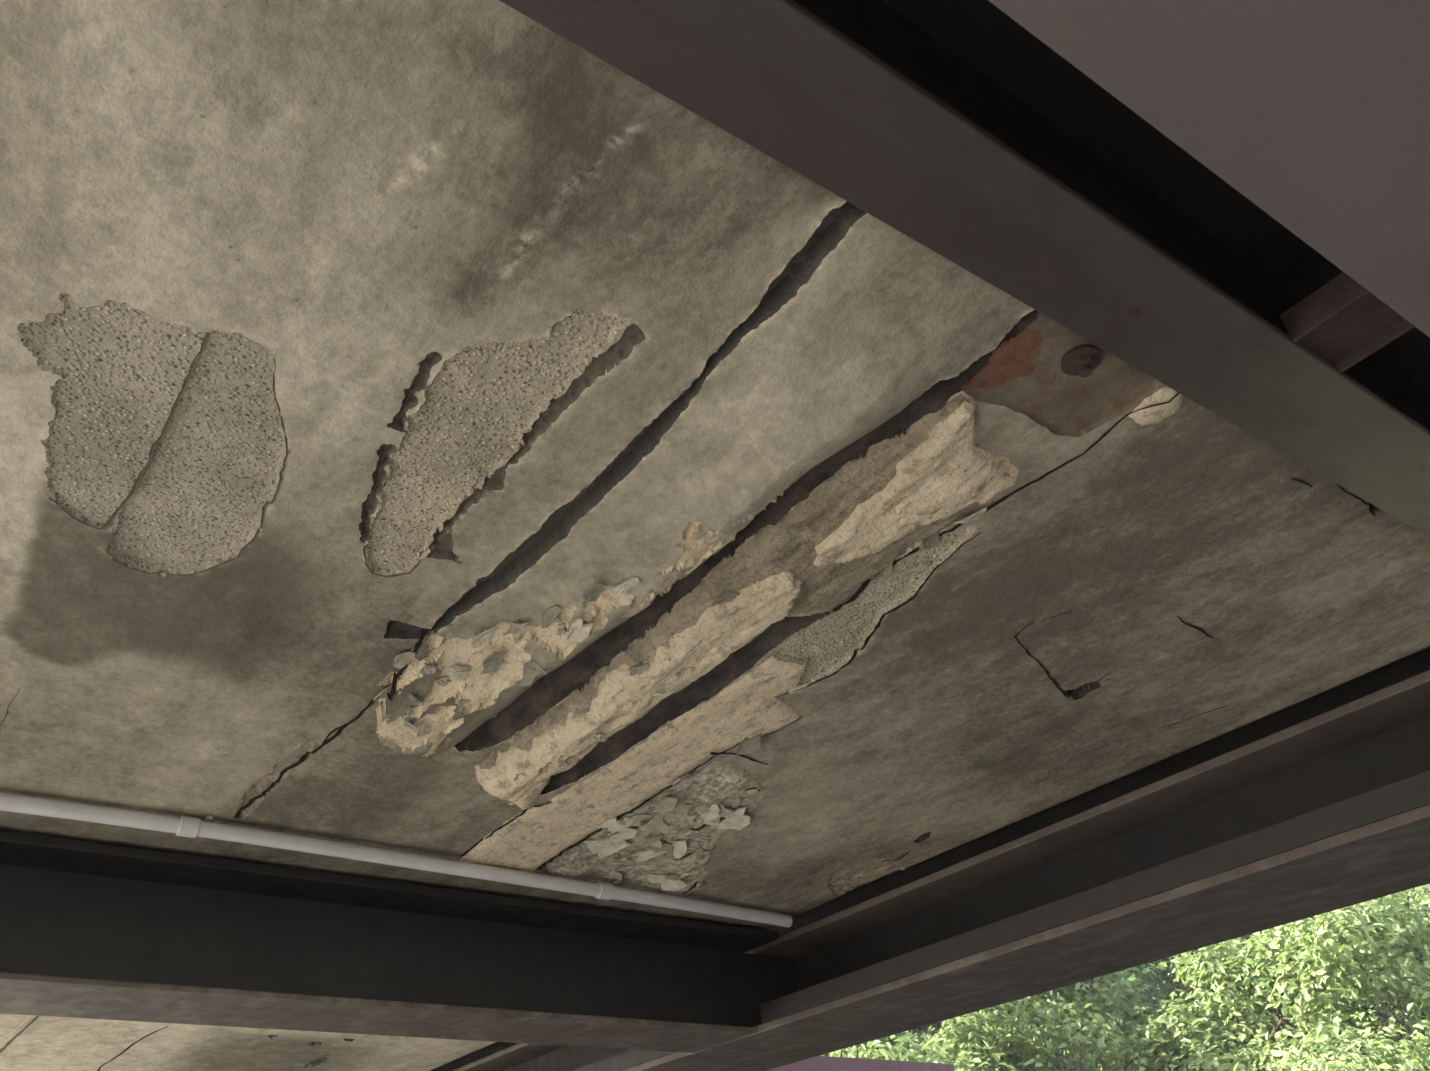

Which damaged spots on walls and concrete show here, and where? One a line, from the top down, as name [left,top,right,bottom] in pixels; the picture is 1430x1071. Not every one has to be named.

peeling [17,293,291,577]
peeling [359,309,645,578]
rust [963,329,1044,389]
water stain [0,459,383,760]
crack [234,628,429,819]
peeling [384,620,438,639]
flaking render [460,528,976,896]
crack [538,393,1179,870]
crack [0,1015,40,1053]
crack [97,1026,168,1071]